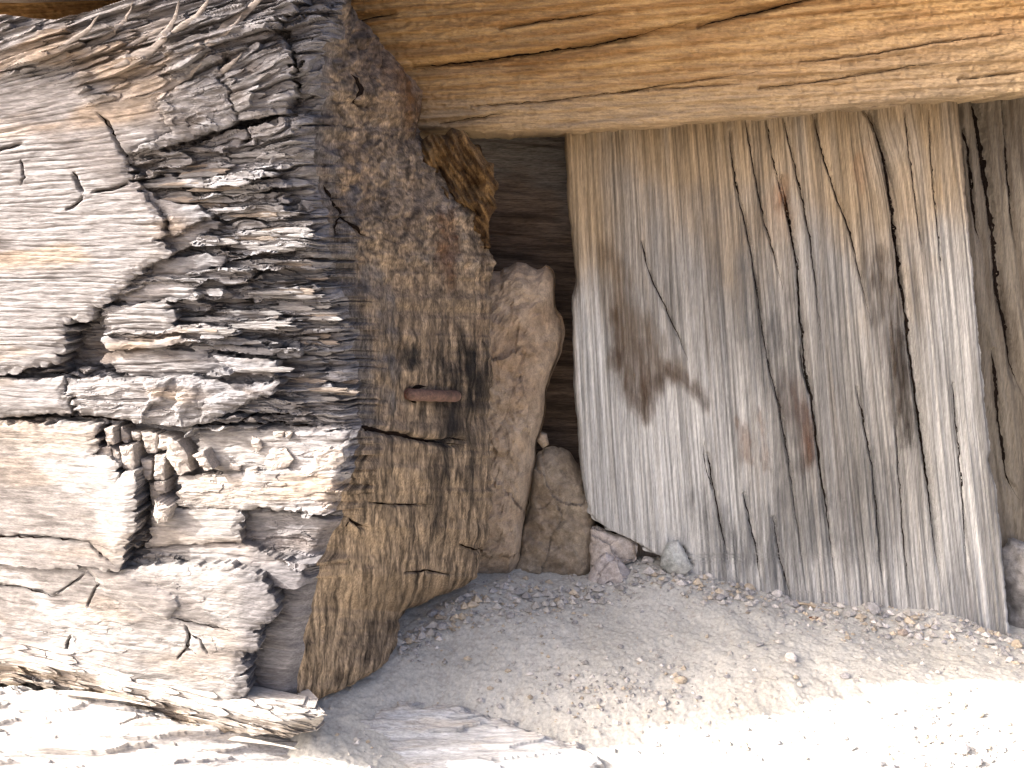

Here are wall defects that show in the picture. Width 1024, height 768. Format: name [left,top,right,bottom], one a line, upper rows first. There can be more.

peeling [37,1,133,67]
peeling [104,0,209,68]
peeling [148,0,262,95]
crack [417,0,806,67]
crack [440,31,1024,124]
peeling [143,150,360,401]
crack [962,104,1024,499]
crack [729,120,837,602]
crack [857,111,942,600]
spalling [97,420,294,527]
spalling [306,446,346,477]
crack [197,412,465,446]